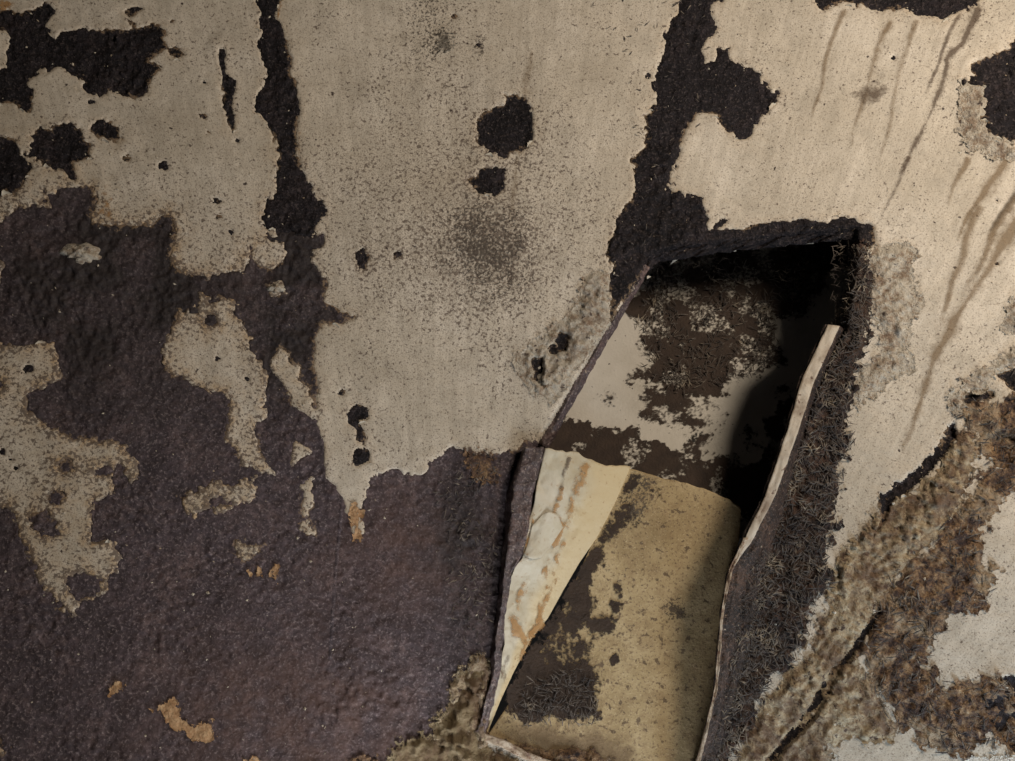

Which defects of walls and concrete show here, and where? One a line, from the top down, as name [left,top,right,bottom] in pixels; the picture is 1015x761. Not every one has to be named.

peeling [953,77,1015,162]
peeling [512,269,615,408]
peeling [946,295,1015,417]
peeling [459,442,501,488]
peeling [524,512,563,559]